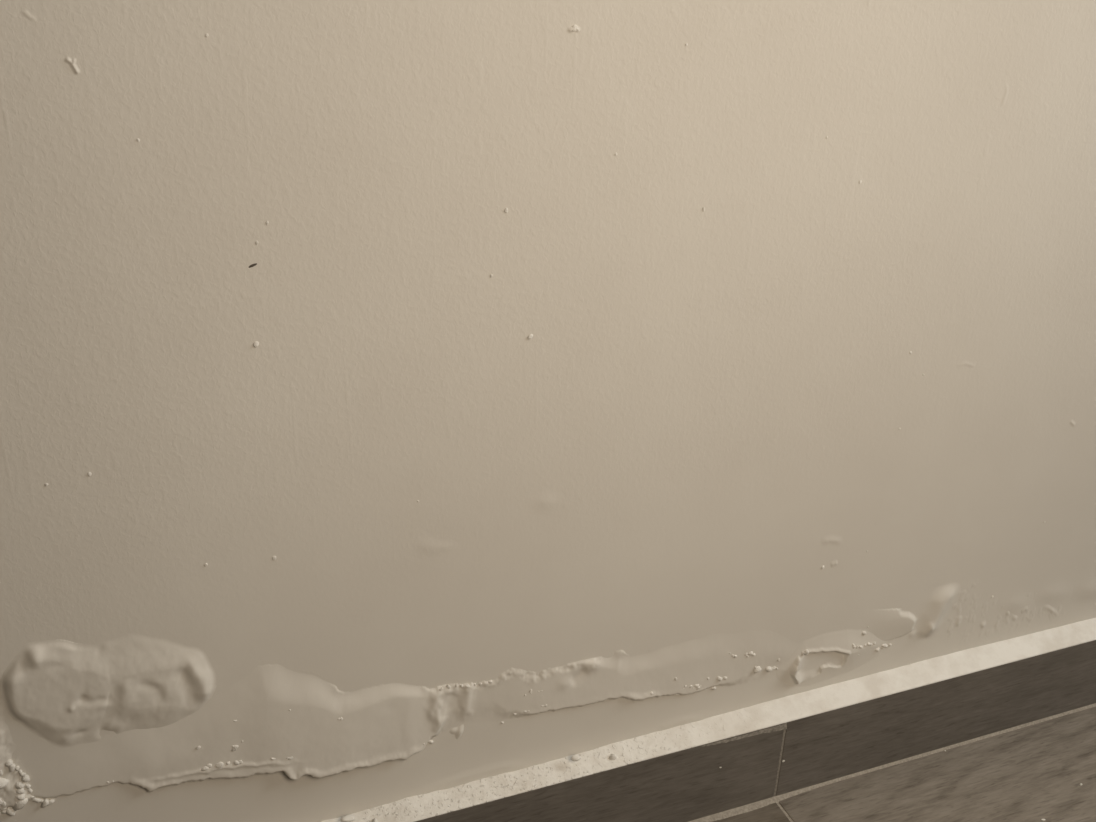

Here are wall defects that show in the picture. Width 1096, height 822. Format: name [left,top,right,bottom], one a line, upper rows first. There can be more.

peeling [28,627,892,799]